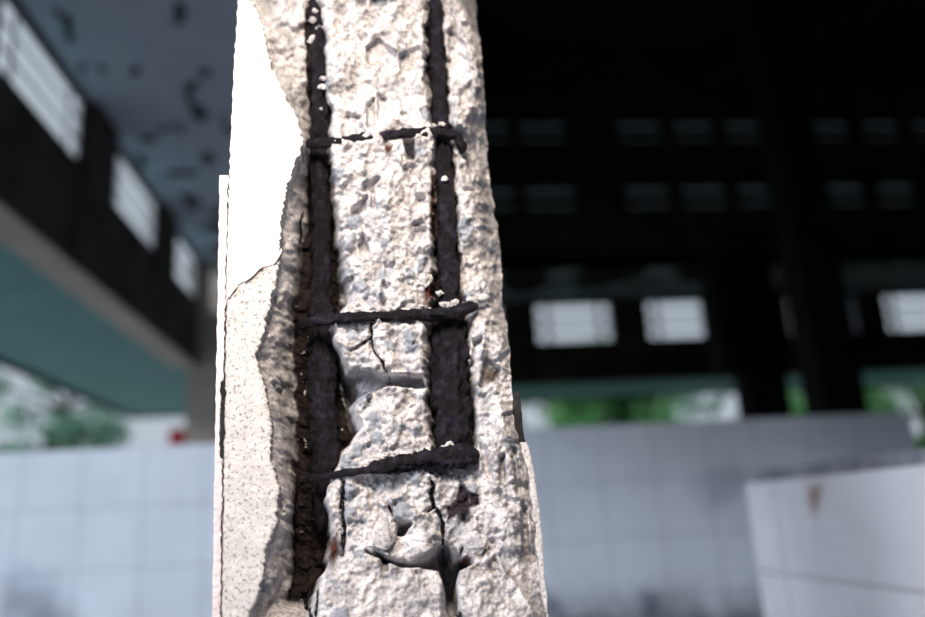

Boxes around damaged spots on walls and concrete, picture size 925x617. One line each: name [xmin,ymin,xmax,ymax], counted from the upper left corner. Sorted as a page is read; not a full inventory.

peeling [182,69,211,124]
peeling [179,193,219,234]
spalling [220,0,552,617]
crack [354,322,391,382]
crack [338,480,346,555]
crack [428,479,488,565]